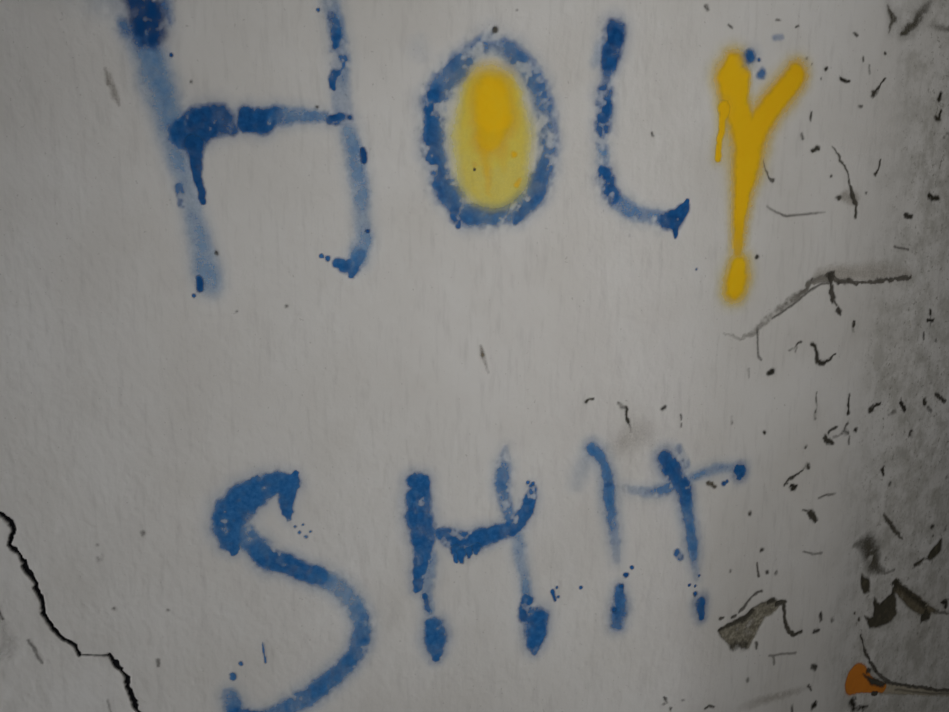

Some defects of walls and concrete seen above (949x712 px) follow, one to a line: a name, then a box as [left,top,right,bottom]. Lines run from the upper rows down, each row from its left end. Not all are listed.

crack [757,271,911,353]
crack [0,512,141,712]
spalling [718,590,832,649]
peeling [854,537,948,628]